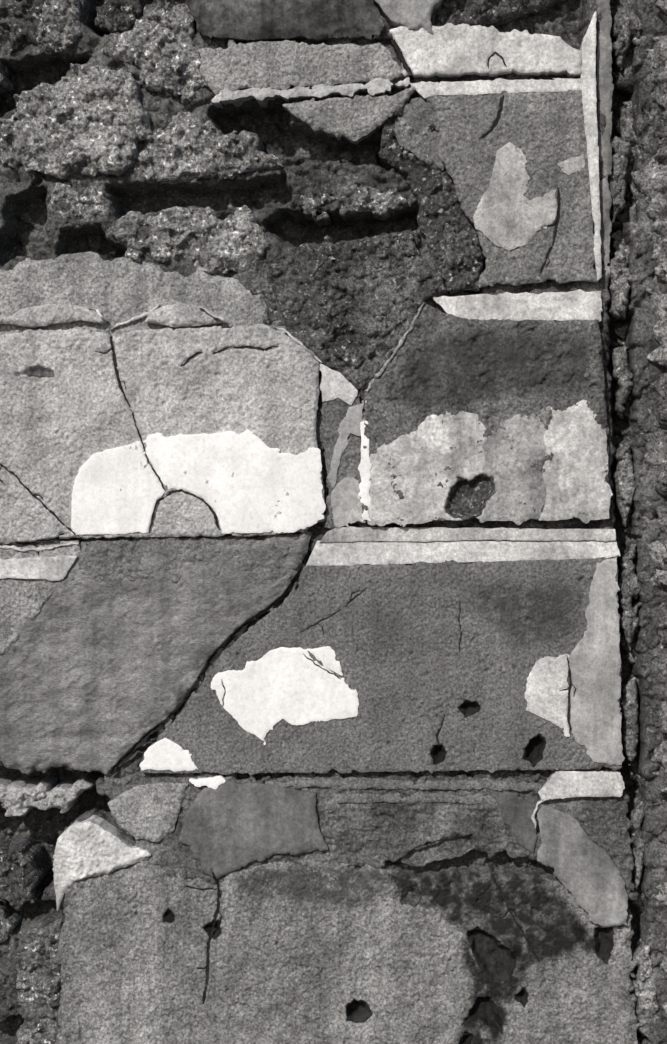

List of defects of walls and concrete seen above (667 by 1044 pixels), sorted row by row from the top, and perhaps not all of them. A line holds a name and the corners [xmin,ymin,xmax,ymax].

spalling [435,0,568,28]
crack [95,333,220,533]
crack [0,463,88,555]
crack [110,555,306,774]
crack [186,871,222,1004]